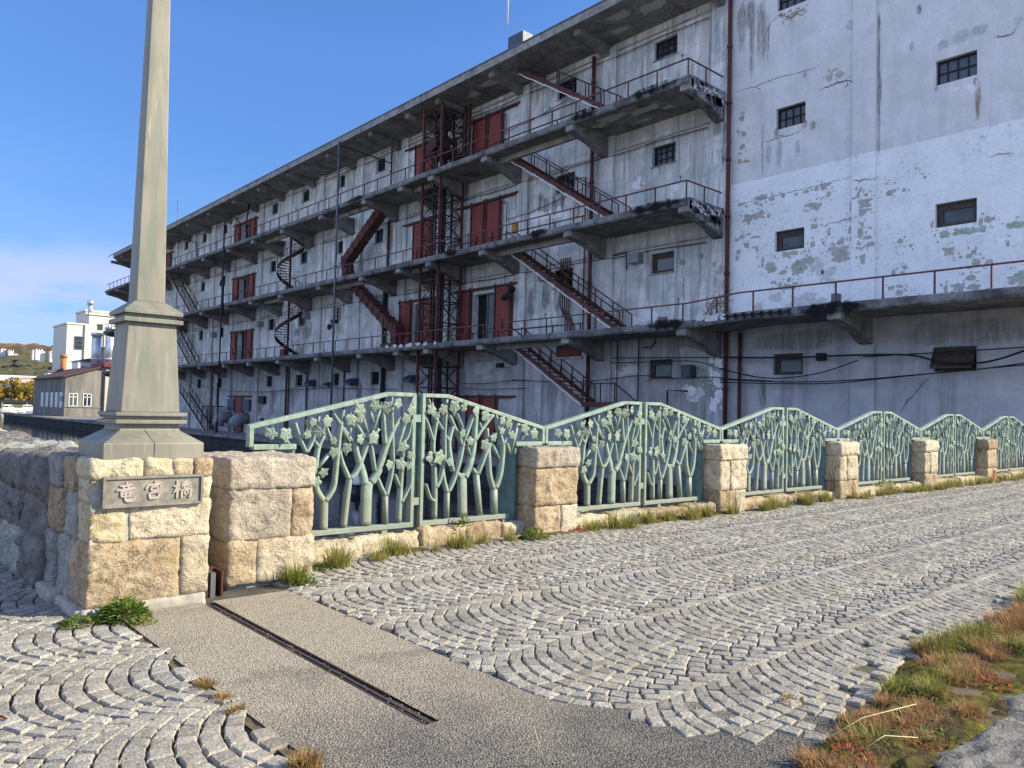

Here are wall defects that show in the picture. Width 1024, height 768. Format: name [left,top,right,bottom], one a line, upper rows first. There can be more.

crack [737,10,852,92]
spalling [694,81,726,107]
spalling [691,201,724,226]
peeling [735,178,910,310]
peeling [930,212,1024,293]
peeling [682,355,723,414]